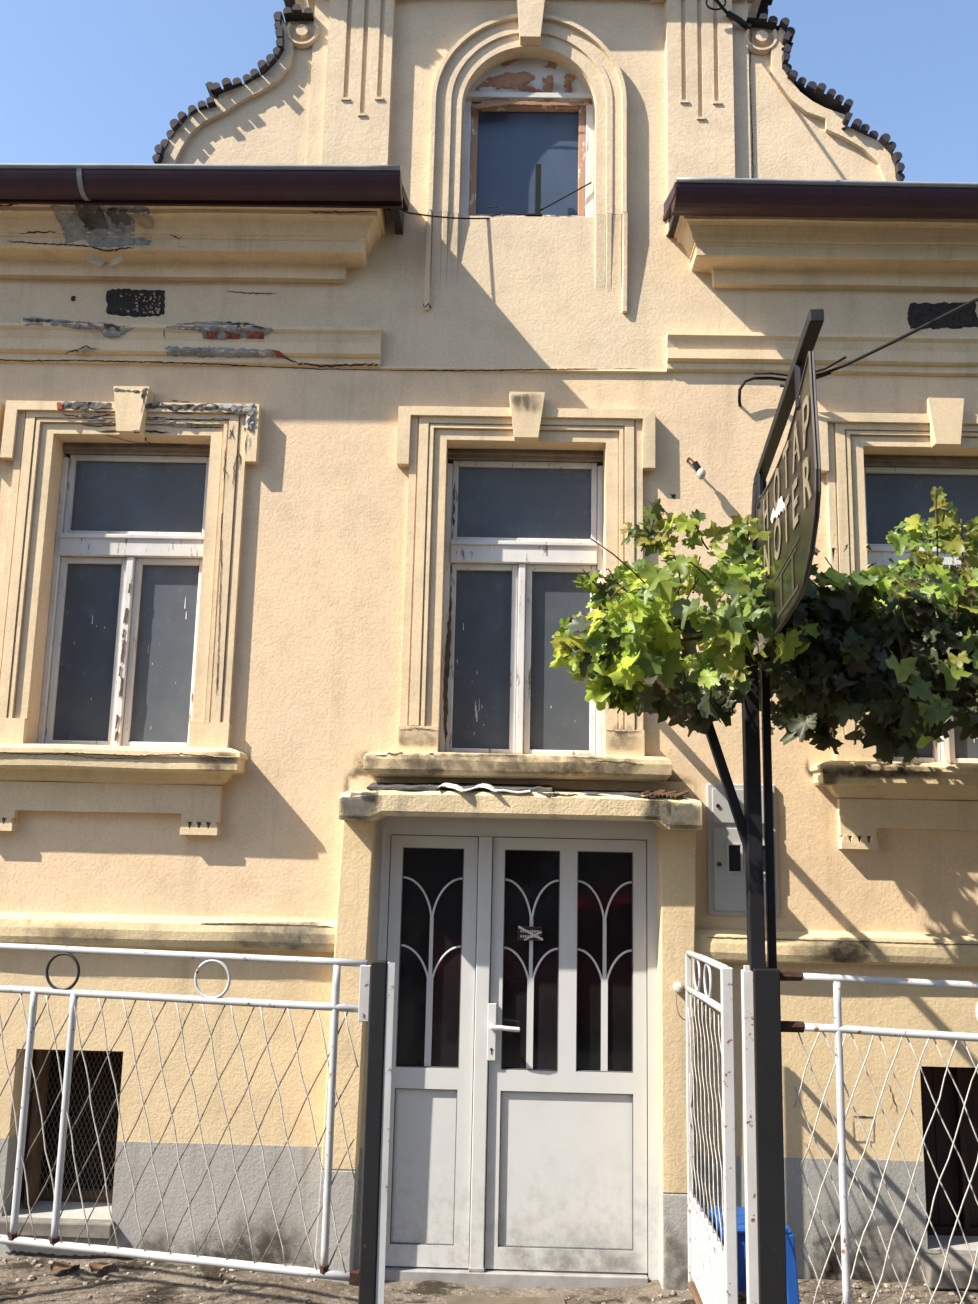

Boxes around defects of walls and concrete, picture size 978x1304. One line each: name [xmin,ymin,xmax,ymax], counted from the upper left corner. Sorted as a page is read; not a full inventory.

peeling [471,58,593,111]
spalling [10,204,153,269]
spalling [18,317,135,338]
spalling [56,388,255,431]
damp [809,939,866,962]